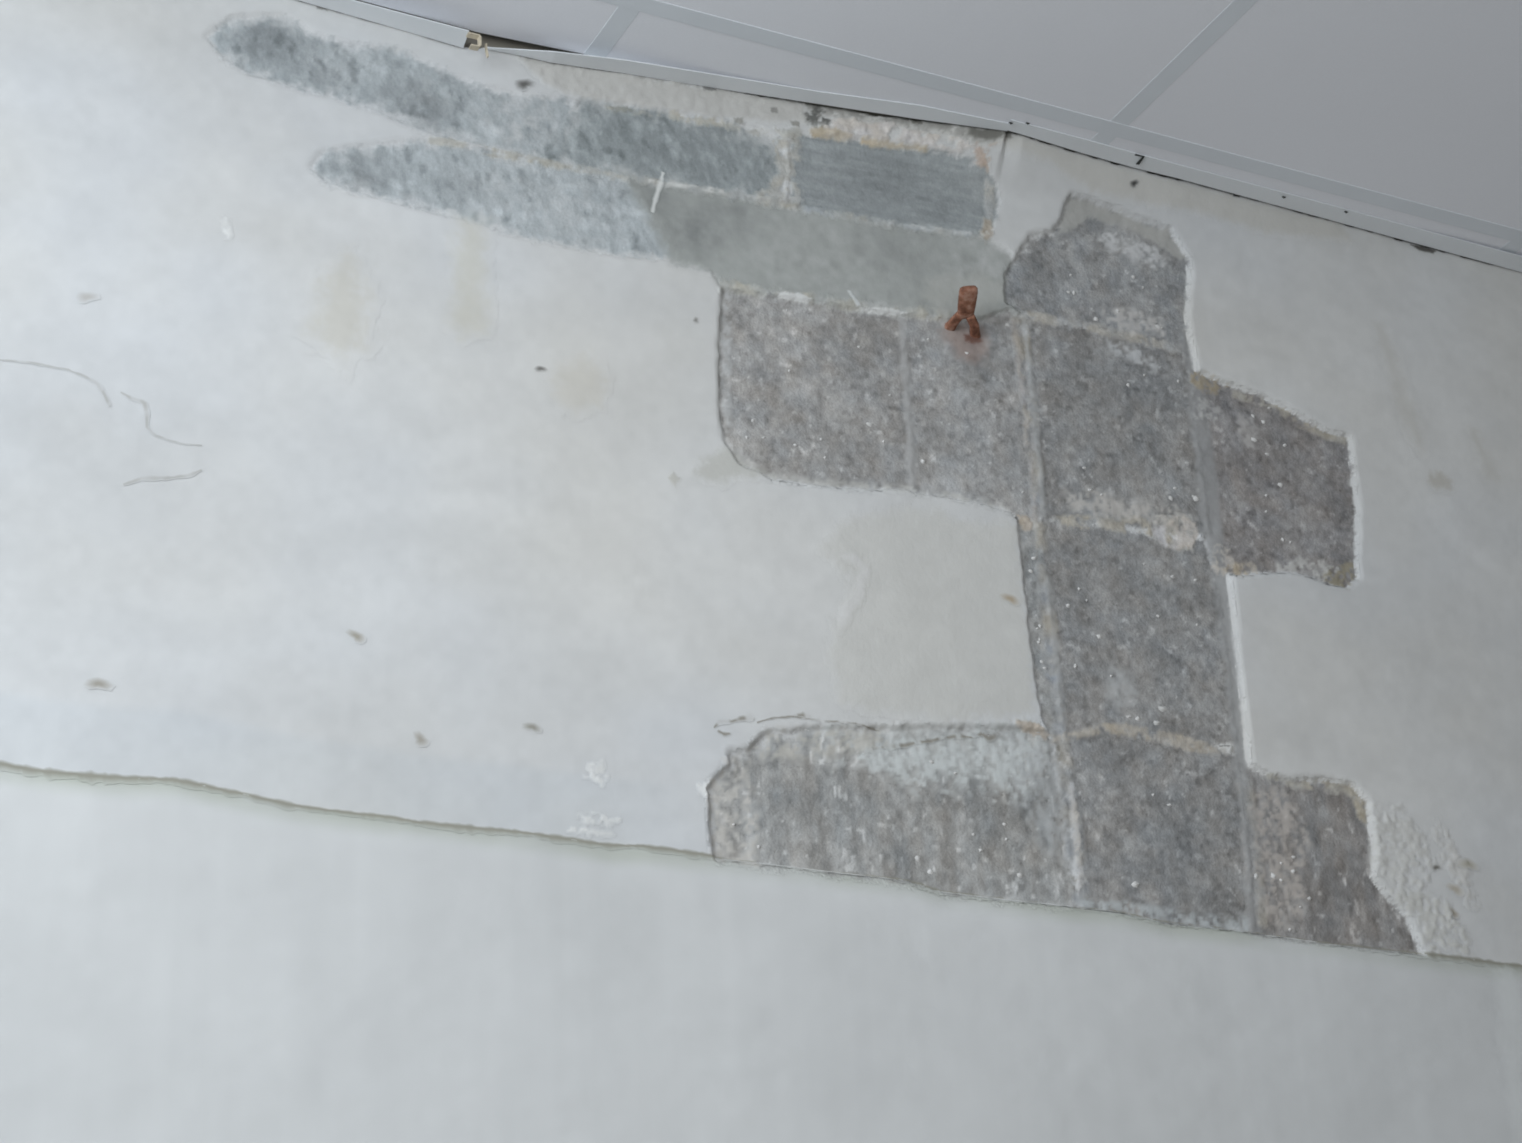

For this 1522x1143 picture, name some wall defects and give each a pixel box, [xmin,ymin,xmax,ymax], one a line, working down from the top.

crack [0,359,202,486]
spalling [207,11,1483,961]